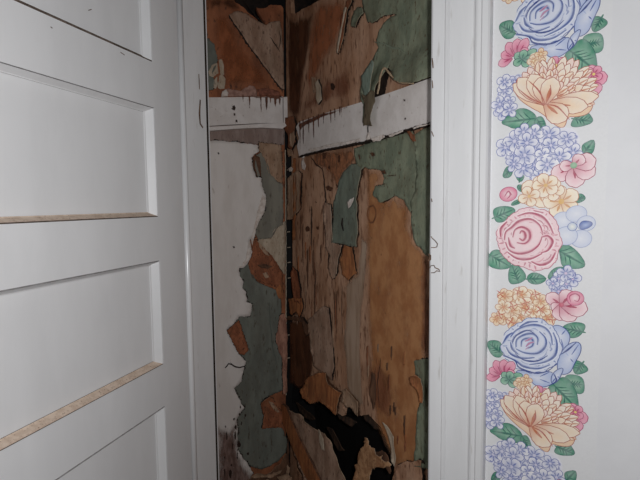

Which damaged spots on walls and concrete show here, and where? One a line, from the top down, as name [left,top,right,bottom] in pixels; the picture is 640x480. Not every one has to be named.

spalling [234,0,269,23]
spalling [294,0,319,13]
peeling [336,0,354,55]
peeling [208,59,226,89]
peeling [210,116,298,480]
spalling [292,384,394,480]